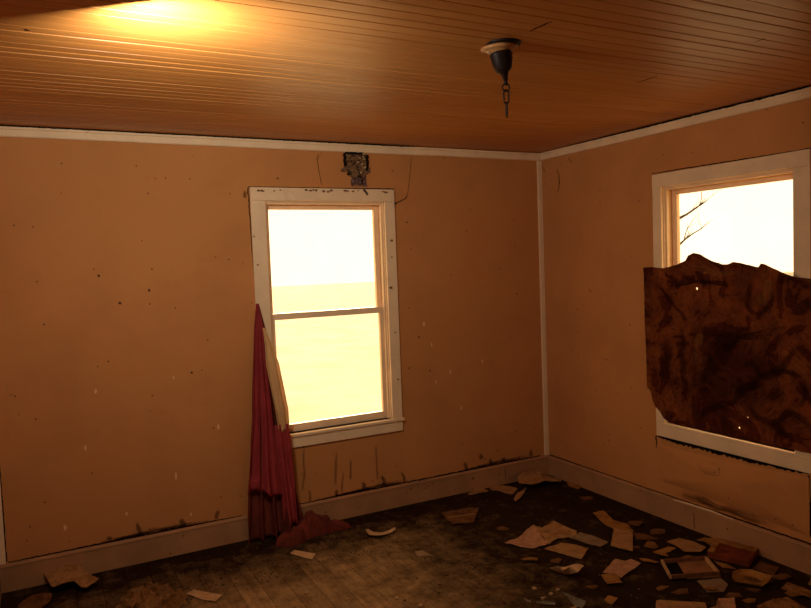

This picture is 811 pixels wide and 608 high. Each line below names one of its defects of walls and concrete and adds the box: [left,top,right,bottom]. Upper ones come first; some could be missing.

crack [247,153,412,277]
spalling [341,152,370,177]
crack [652,147,811,174]
crack [300,435,811,545]